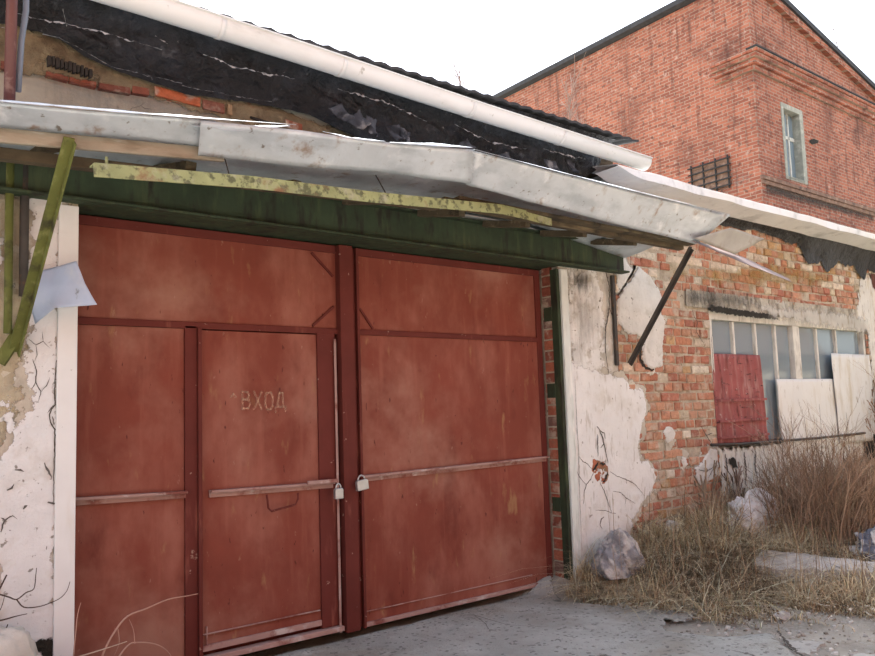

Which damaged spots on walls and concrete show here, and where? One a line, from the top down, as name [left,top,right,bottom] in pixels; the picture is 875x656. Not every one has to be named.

flaking render [16,26,358,138]
peeling [29,198,47,268]
peeling [43,217,58,270]
peeling [0,308,57,656]
crack [30,334,57,502]
crack [575,387,643,537]
peeling [567,268,660,573]